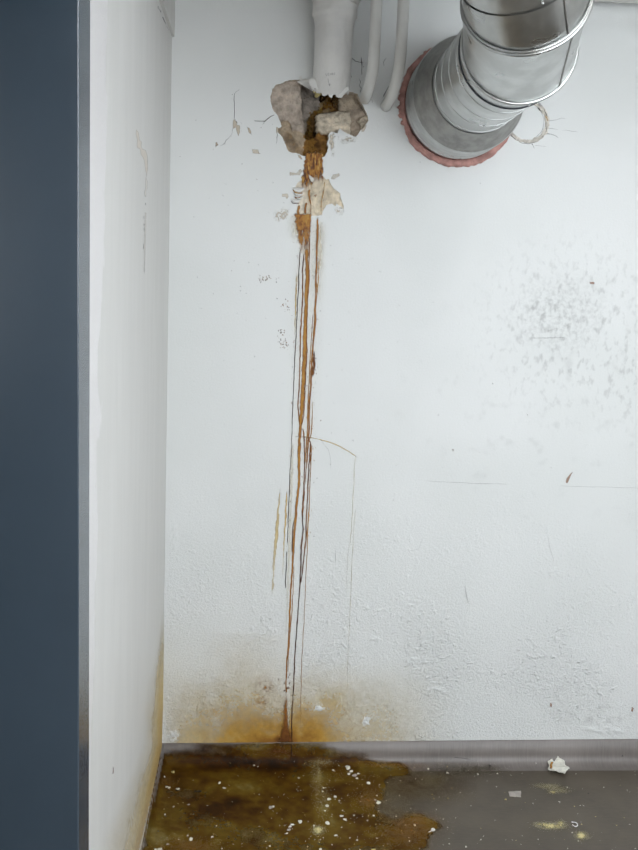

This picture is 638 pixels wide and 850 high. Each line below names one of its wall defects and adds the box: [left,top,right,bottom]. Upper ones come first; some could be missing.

flaking render [270,76,369,159]
peeling [276,169,344,219]
rust [302,153,324,188]
rust [142,214,443,850]
damp [178,695,349,743]